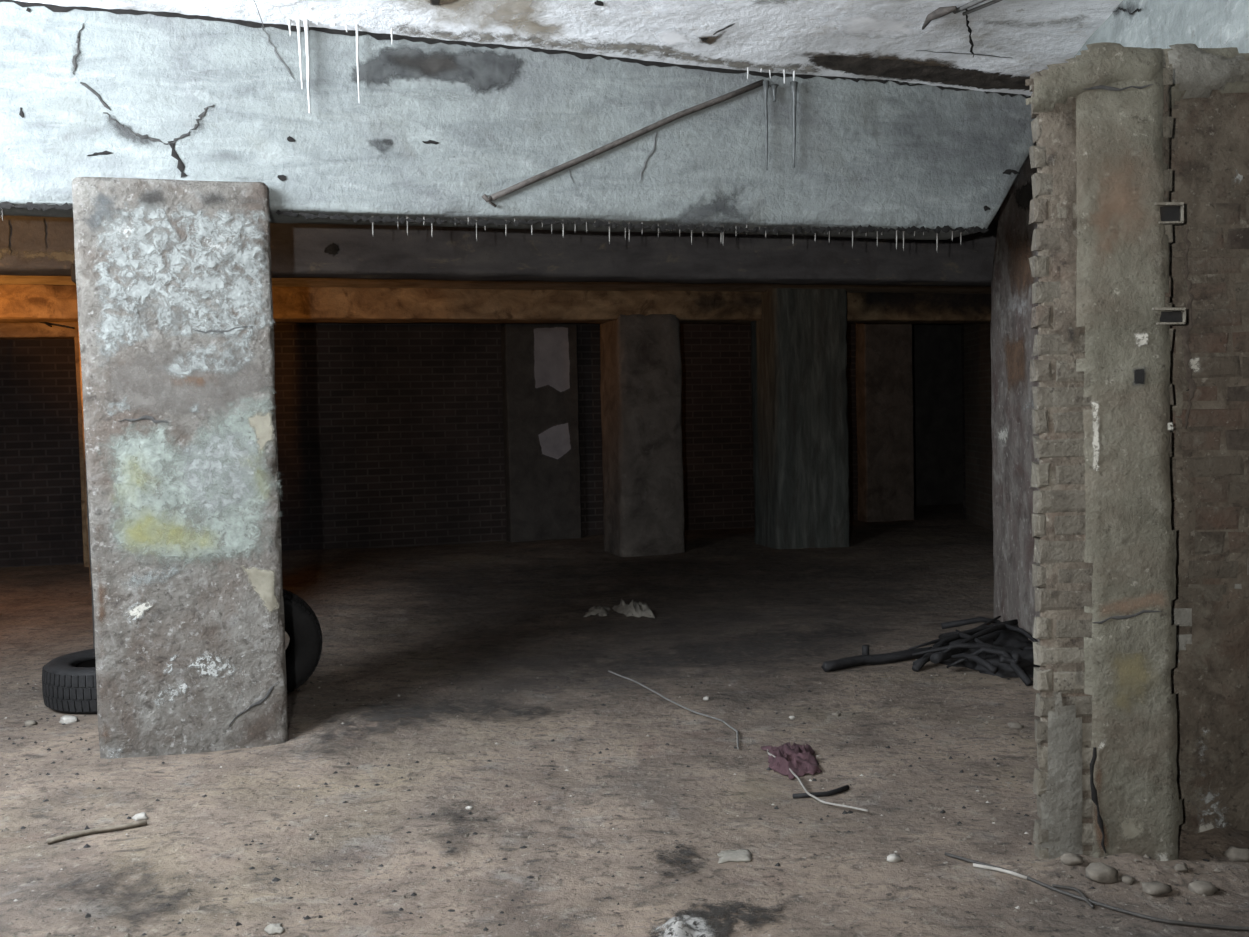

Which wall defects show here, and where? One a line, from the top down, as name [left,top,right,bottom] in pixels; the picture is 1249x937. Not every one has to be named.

damp [421,0,558,34]
crack [72,24,215,178]
damp [351,46,523,98]
spalling [1181,229,1196,430]
crack [1090,747,1106,853]